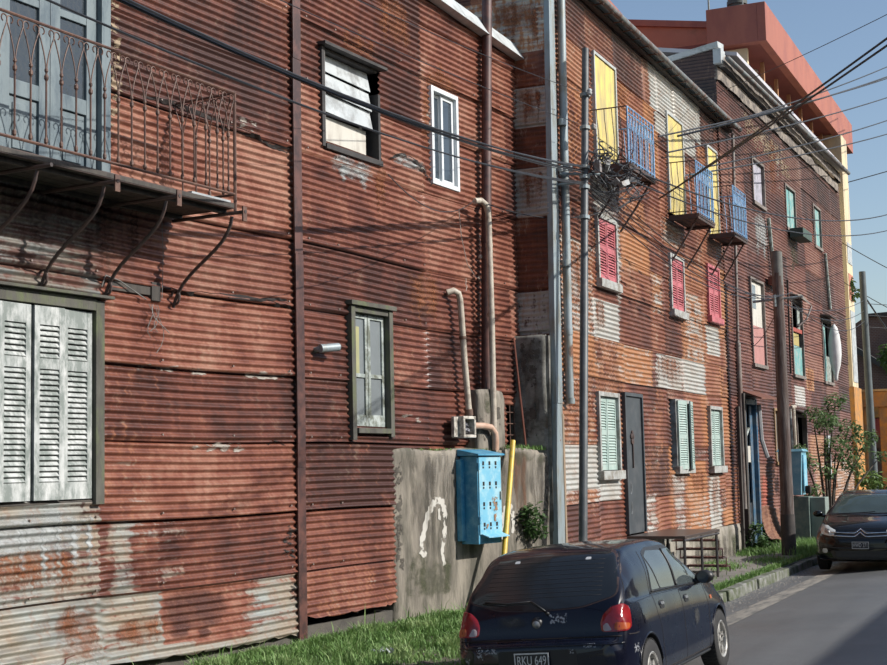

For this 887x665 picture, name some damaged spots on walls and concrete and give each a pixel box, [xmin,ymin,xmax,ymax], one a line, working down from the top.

corrosion [498,6,538,42]
corrosion [0,549,72,588]
corrosion [57,608,97,652]
corrosion [118,615,158,644]